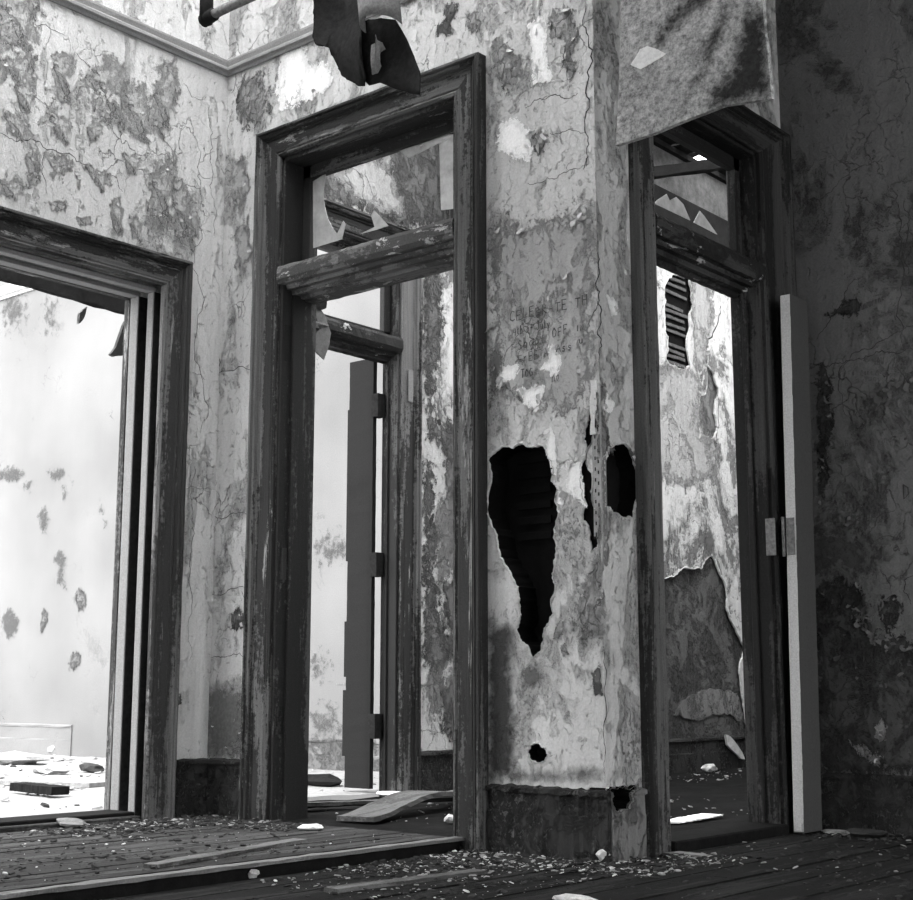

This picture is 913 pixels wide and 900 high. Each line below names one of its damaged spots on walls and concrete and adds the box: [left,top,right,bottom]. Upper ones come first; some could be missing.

crack [2,133,120,193]
peeling [0,0,200,251]
peeling [495,116,549,164]
peeling [487,3,581,98]
crack [526,9,593,185]
peeling [486,203,637,659]
peeling [659,273,721,488]
crack [818,200,911,419]
crack [187,471,244,658]
spalling [664,553,745,739]
spalling [526,741,549,764]
spalling [589,784,639,813]